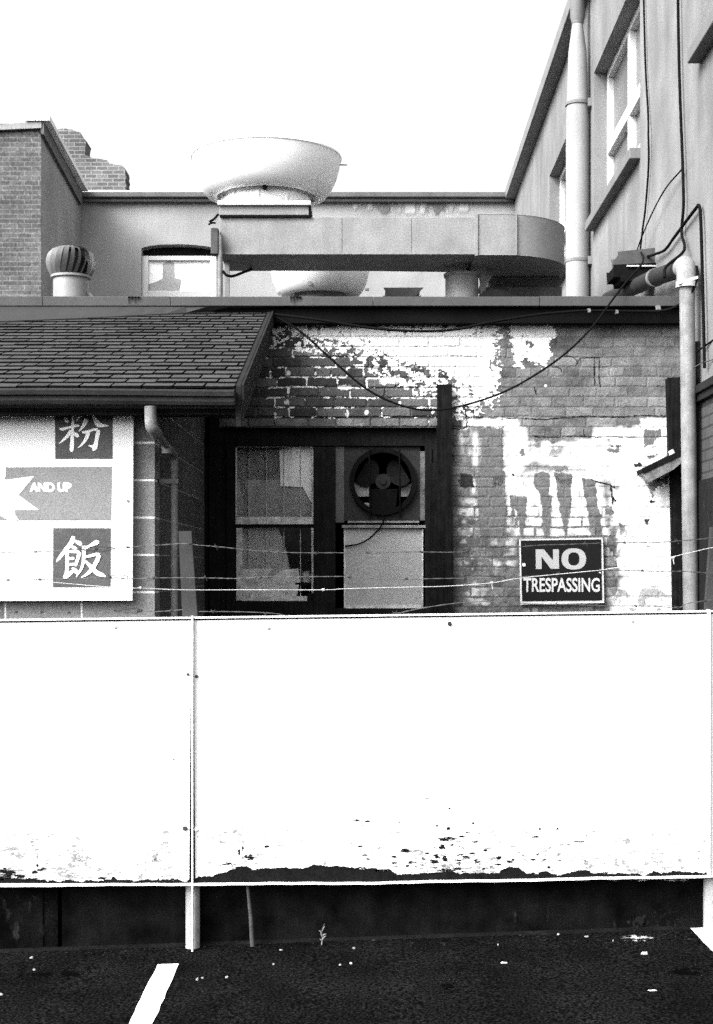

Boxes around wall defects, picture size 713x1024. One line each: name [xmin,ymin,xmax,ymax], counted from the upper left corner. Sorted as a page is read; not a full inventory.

peeling [266,325,672,611]
water stain [458,428,602,550]
peeling [0,819,707,883]